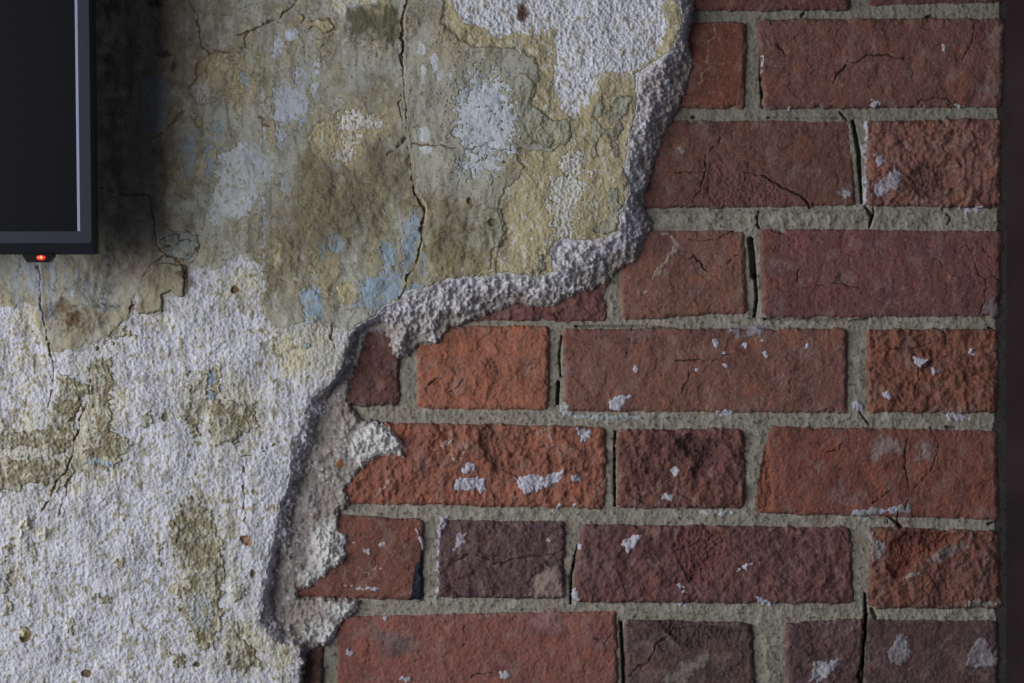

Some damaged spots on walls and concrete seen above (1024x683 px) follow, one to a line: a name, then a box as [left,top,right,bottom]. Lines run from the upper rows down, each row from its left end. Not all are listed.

damp [347,4,398,42]
crack [387,0,512,299]
damp [10,255,119,321]
crack [32,266,135,521]
peeling [0,0,694,683]